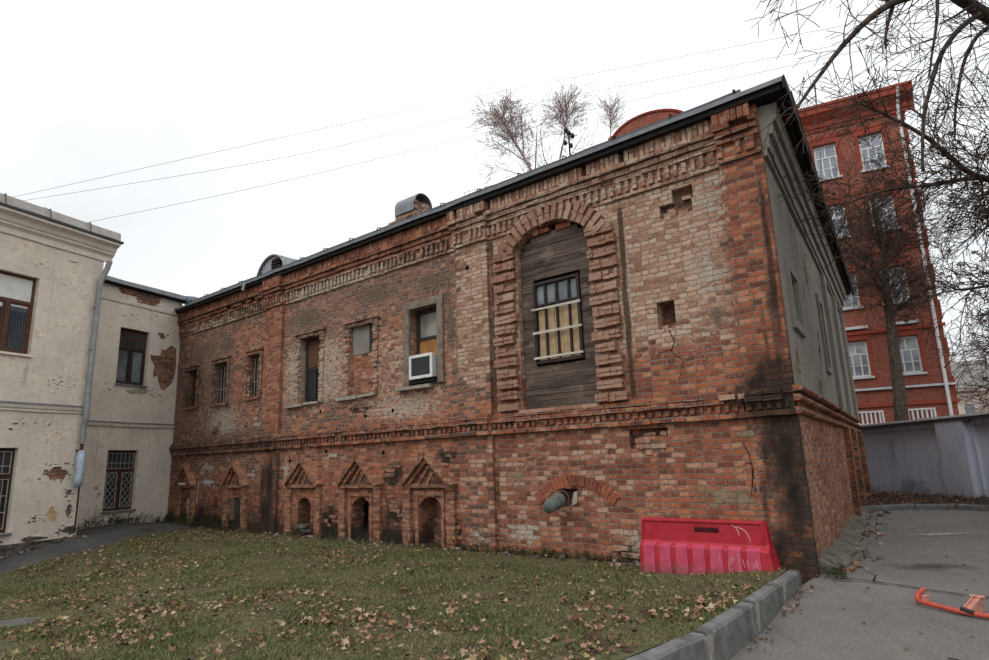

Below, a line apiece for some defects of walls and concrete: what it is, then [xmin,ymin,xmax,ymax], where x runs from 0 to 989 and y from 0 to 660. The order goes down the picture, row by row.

spalling [119,288,177,404]
spalling [20,461,76,542]